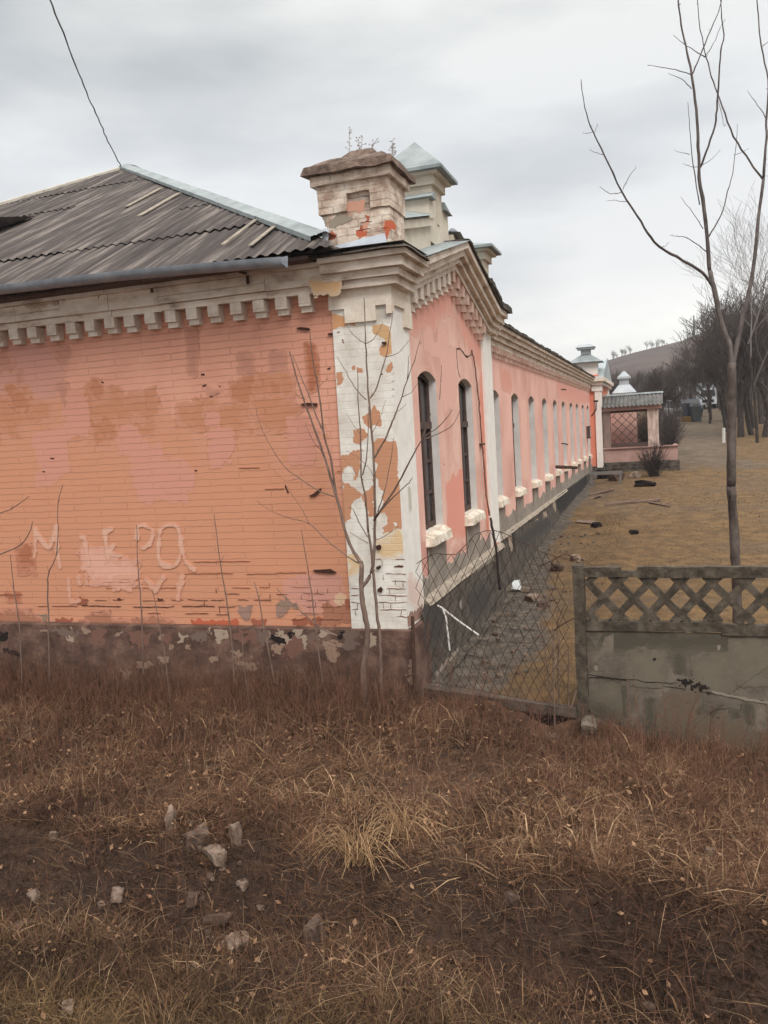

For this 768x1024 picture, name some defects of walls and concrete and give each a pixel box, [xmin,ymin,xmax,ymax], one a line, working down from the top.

spalling [347,199,370,238]
spalling [383,220,396,239]
peeling [332,313,355,344]
water stain [183,327,200,378]
peeling [372,324,393,375]
peeling [327,365,363,385]
water stain [0,341,362,627]
peeling [341,405,402,534]
spalling [0,631,23,658]
spalling [37,596,377,682]
crack [589,676,673,684]